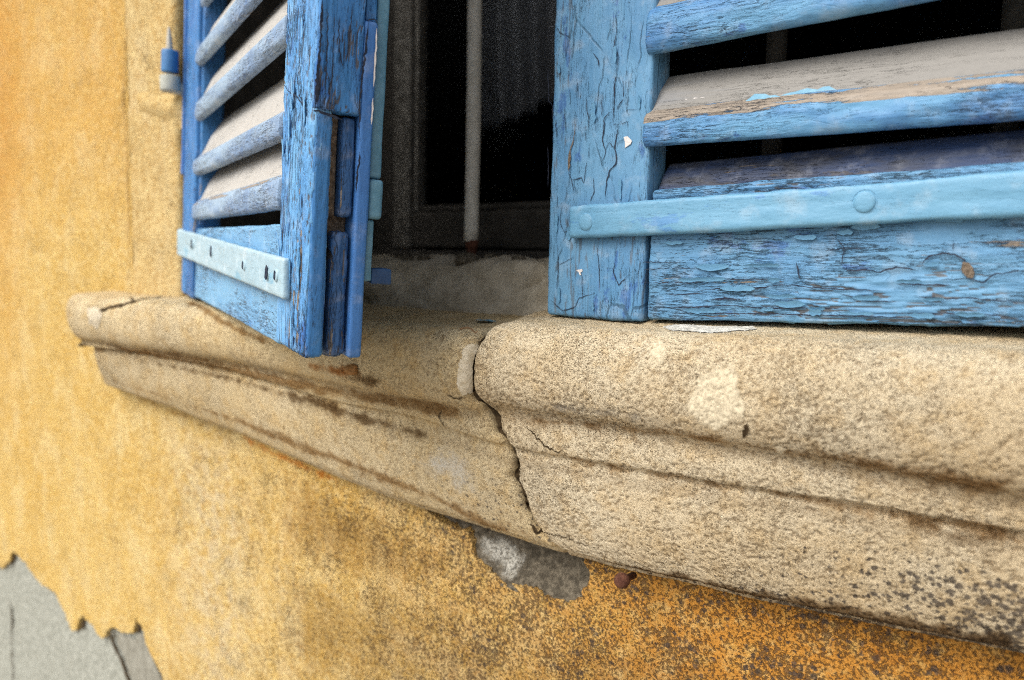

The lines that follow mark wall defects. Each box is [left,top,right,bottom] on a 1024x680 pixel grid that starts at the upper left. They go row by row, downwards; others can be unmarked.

crack [99,295,169,312]
crack [438,336,597,549]
spalling [444,515,590,602]
peeling [0,552,163,680]
damp [790,599,1008,647]